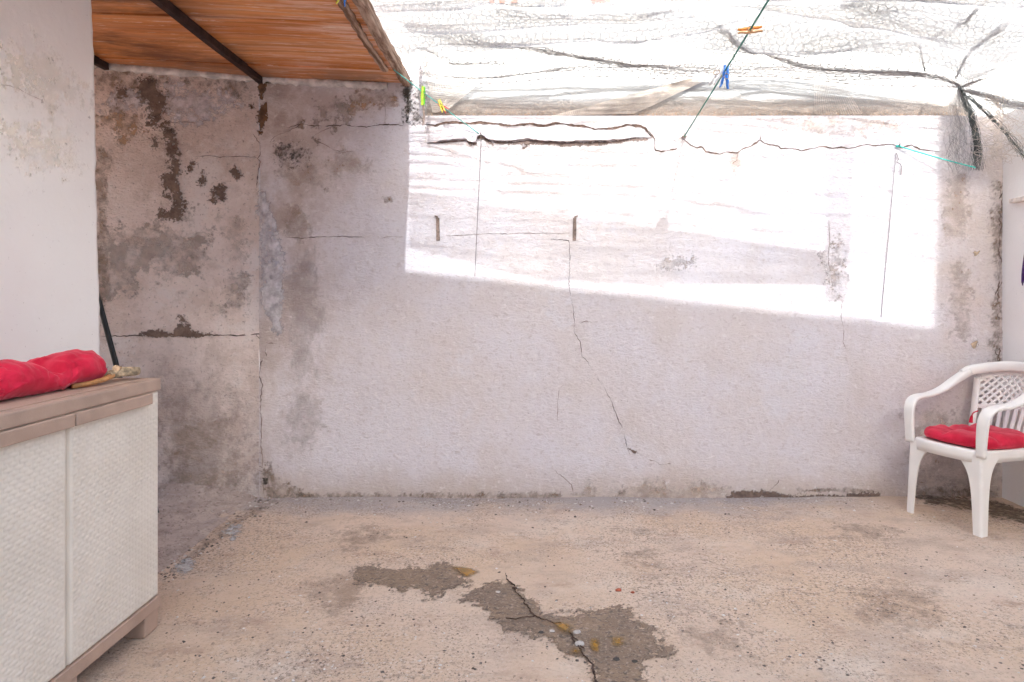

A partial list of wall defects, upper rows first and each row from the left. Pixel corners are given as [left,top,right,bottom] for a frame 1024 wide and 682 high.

damp [94,71,144,118]
damp [274,142,304,168]
crack [193,110,403,188]
damp [95,148,213,300]
crack [446,233,670,465]
crack [104,314,273,496]
crack [505,573,598,682]